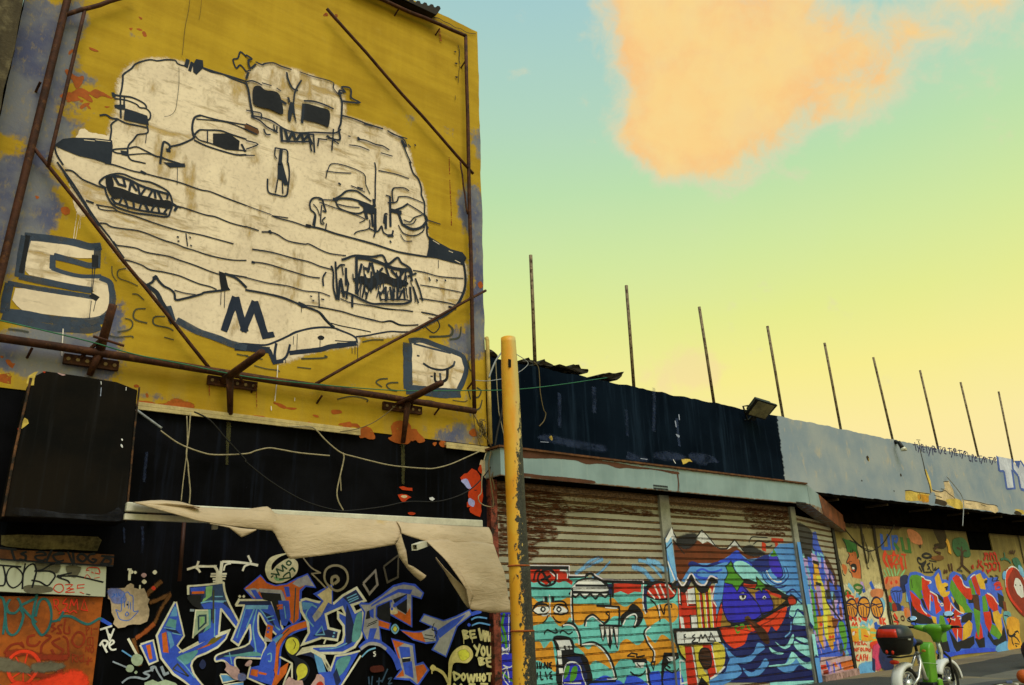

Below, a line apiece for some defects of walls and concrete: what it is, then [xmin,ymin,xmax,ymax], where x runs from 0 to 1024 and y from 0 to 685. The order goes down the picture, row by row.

peeling [388,421,446,447]
peeling [460,460,485,517]
corrosion [497,485,508,551]
corrosion [524,473,653,561]
corrosion [523,450,679,491]
spalling [893,481,999,513]